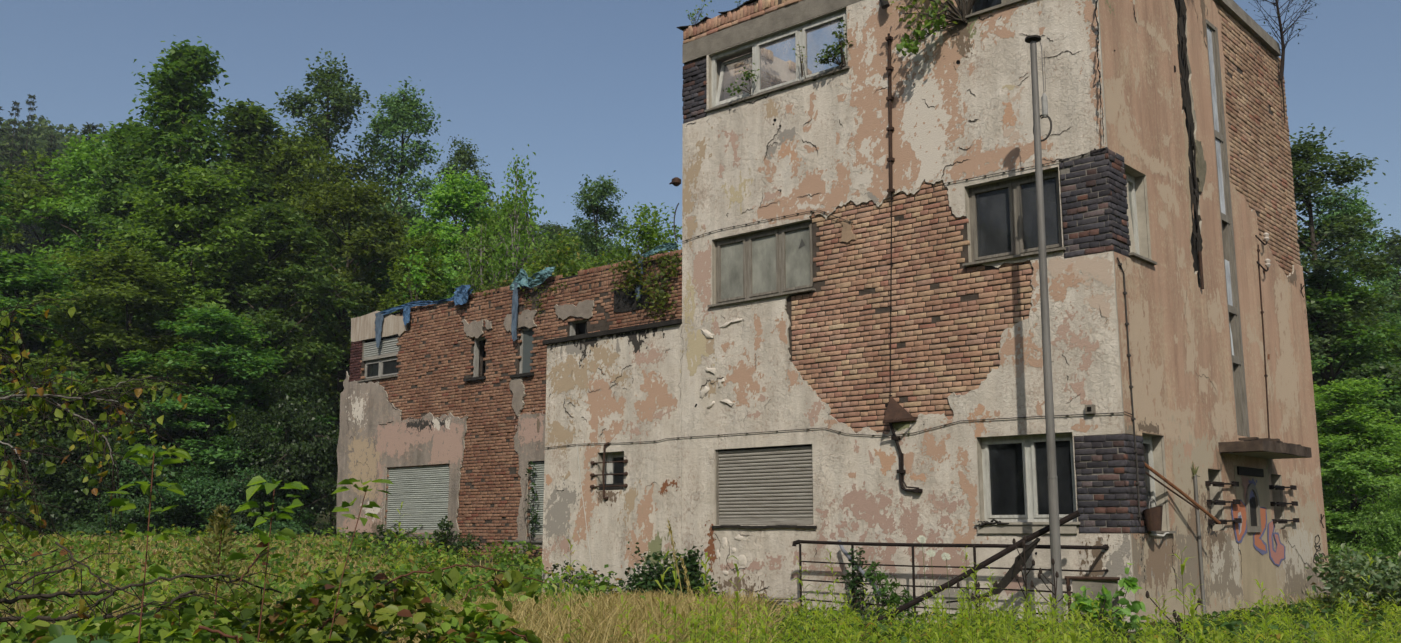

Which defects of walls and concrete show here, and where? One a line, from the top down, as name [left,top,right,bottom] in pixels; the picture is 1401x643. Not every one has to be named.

crack [941,89,979,179]
crack [978,0,1104,162]
flaking render [684,0,1115,581]
peeling [340,418,465,538]
peeling [518,344,678,574]